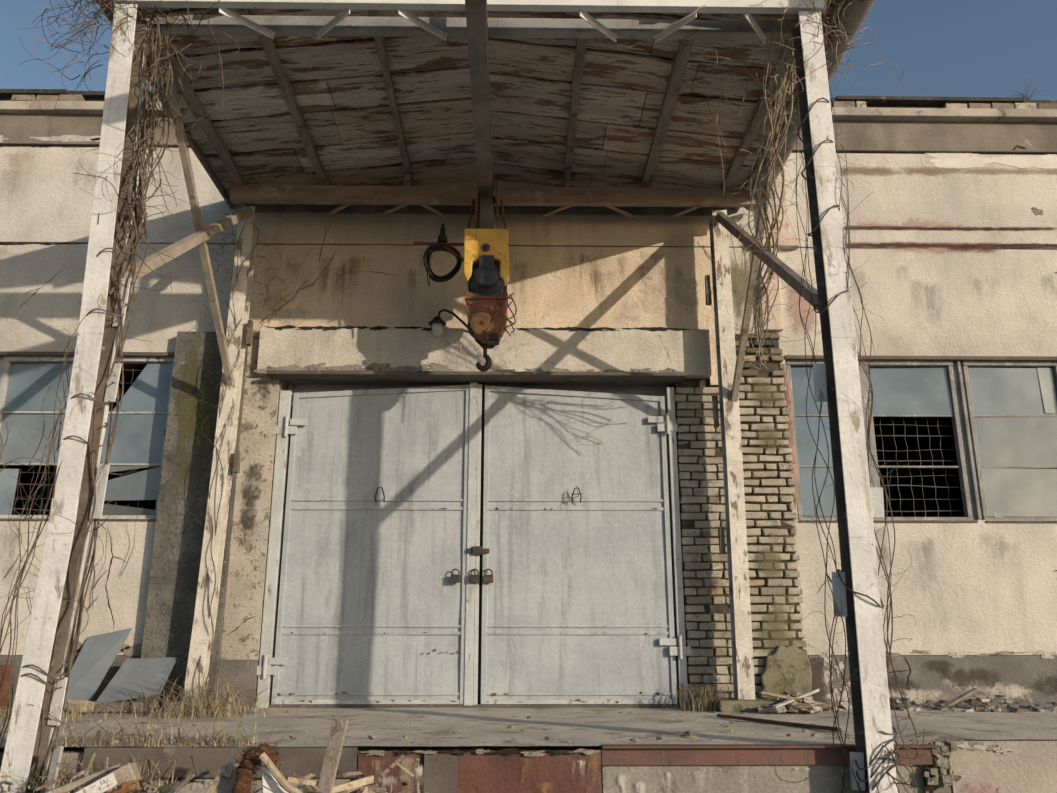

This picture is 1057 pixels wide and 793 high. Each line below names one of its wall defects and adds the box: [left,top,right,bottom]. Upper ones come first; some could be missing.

peeling [925,152,1057,169]
crack [0,239,86,247]
corrosion [845,220,1057,252]
crack [514,325,704,333]
water stain [179,354,220,450]
water stain [241,464,261,536]
corrosion [357,749,602,793]